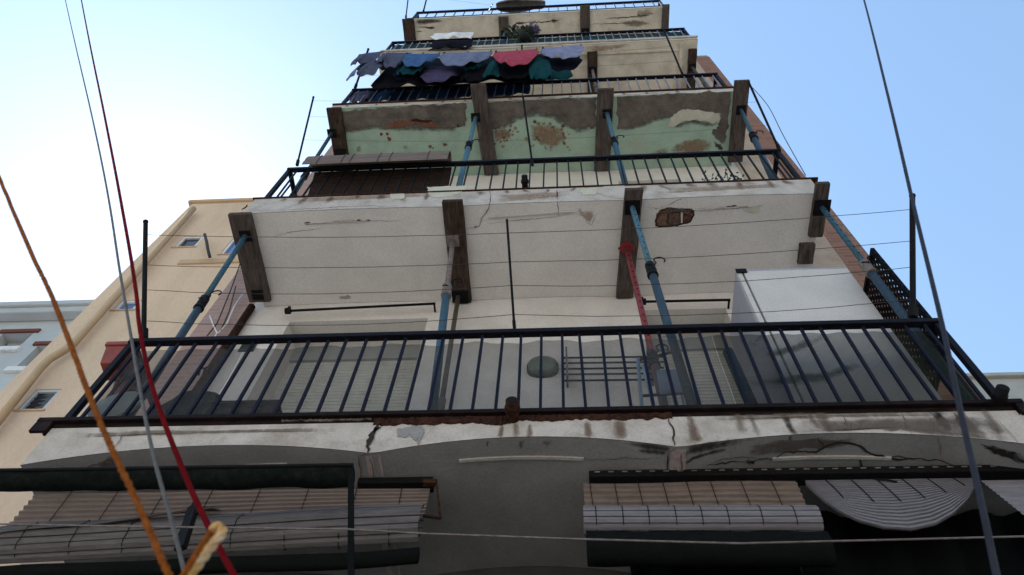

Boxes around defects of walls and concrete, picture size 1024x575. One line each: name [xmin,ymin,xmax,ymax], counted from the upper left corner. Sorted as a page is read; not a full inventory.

peeling [342,102,467,141]
peeling [616,91,731,142]
corrosion [676,140,709,152]
crack [466,190,597,229]
spalling [655,205,762,227]
crack [358,424,433,478]
peeling [397,425,425,445]
corrosion [281,412,673,448]
crack [587,415,952,471]